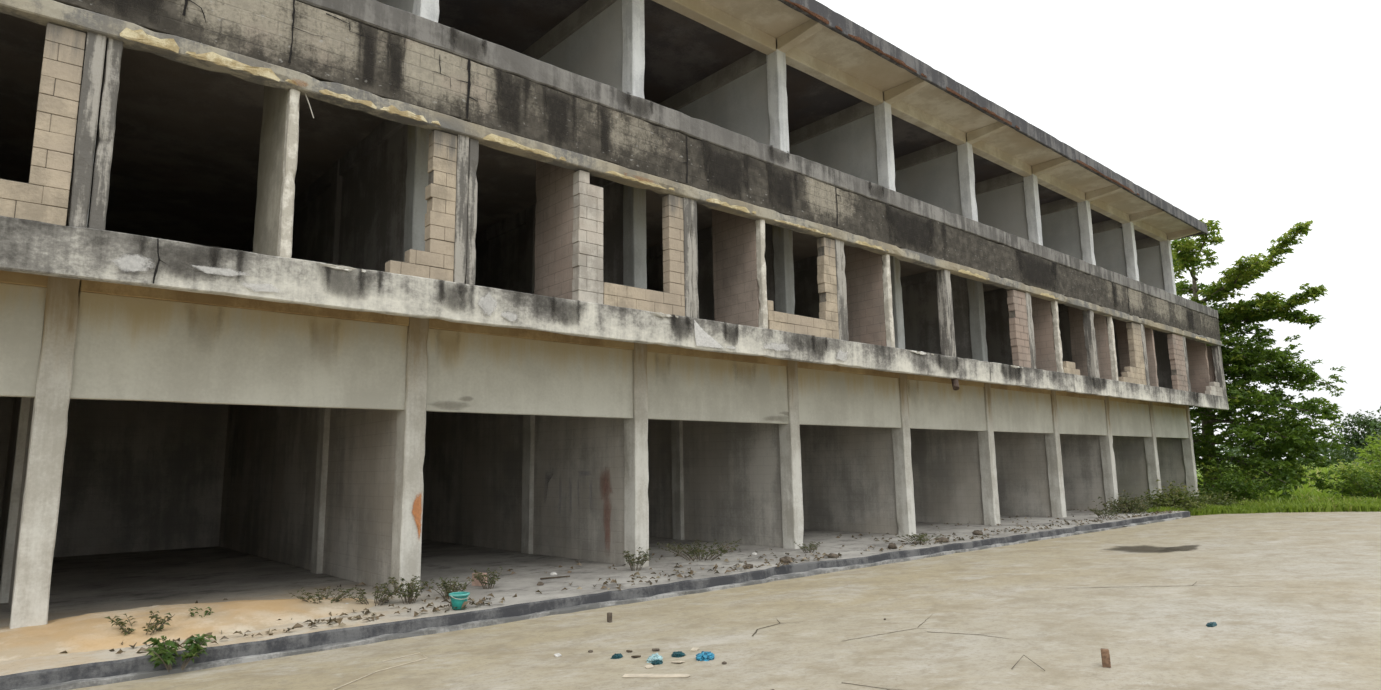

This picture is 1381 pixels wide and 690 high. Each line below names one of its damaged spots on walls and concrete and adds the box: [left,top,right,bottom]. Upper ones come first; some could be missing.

crack [182,0,206,22]
crack [288,0,376,63]
spalling [120,27,300,258]
spalling [319,89,441,126]
leakage [496,69,576,140]
leakage [598,104,608,151]
leakage [767,145,798,210]
crack [153,238,168,284]
leakage [142,236,219,273]
leakage [326,263,382,293]
leakage [440,280,474,307]
rust [412,494,422,538]